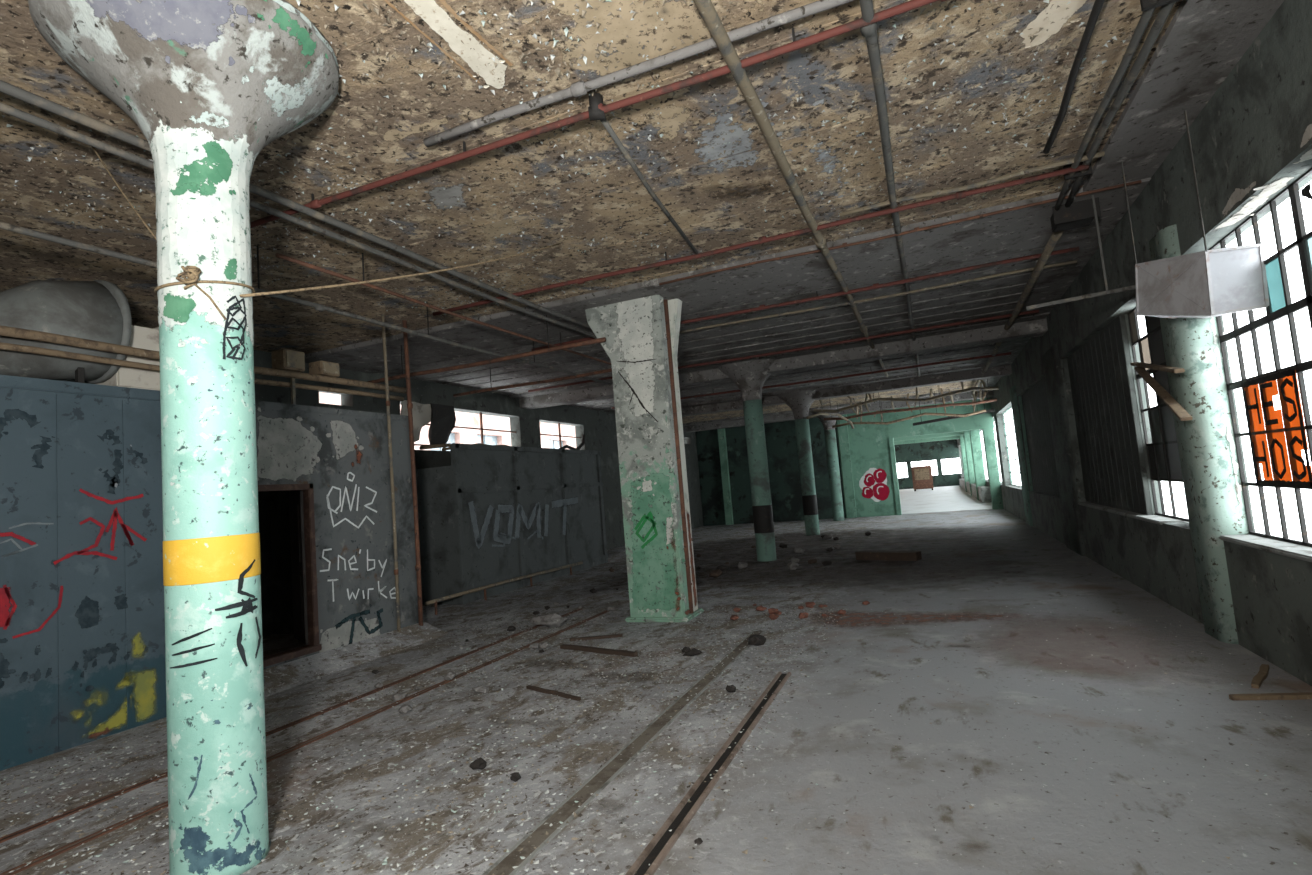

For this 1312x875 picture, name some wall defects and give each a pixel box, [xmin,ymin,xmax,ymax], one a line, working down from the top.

peeling [0,0,1142,425]
flaking render [252,404,364,482]
peeling [625,470,685,614]
peeling [179,825,271,875]